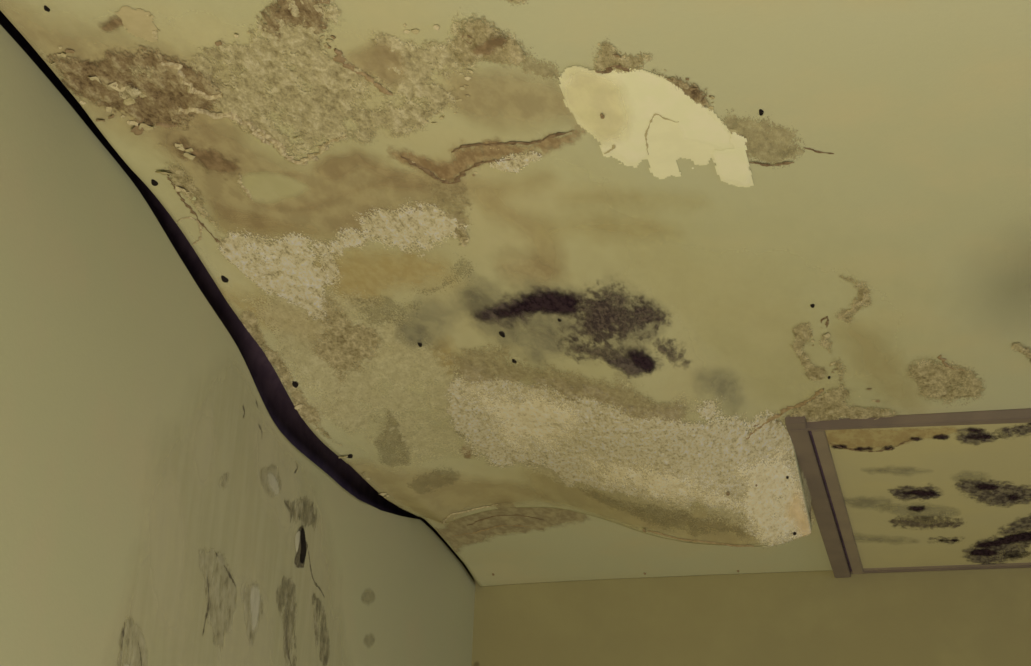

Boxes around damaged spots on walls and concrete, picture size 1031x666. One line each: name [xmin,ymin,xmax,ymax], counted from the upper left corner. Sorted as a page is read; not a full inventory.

flaking render [40,0,529,165]
flaking render [558,42,794,187]
flaking render [155,143,229,252]
water stain [172,134,816,551]
water stain [830,437,920,452]
flaking render [906,355,986,406]
water stain [933,423,1031,445]
water stain [847,474,1031,565]